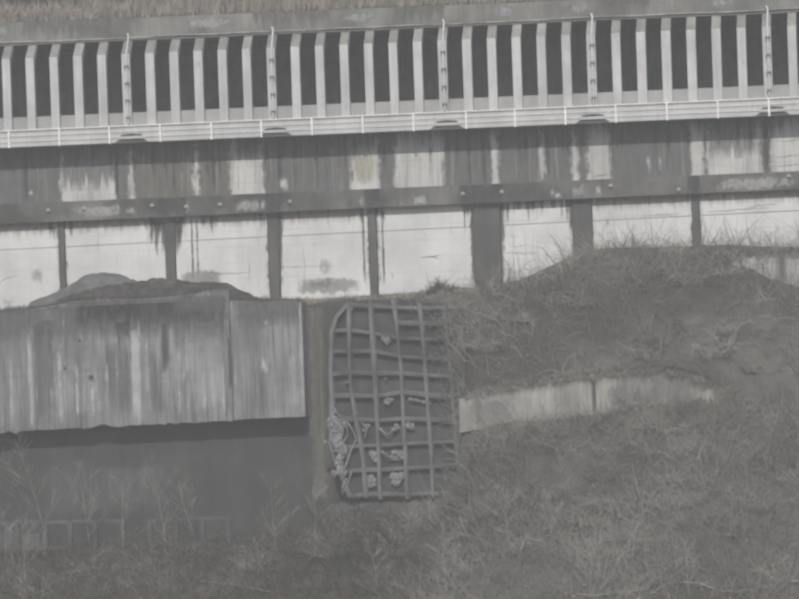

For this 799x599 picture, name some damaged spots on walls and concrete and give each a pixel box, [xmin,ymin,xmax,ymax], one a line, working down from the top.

water stain [0,131,409,285]
water stain [420,115,792,282]
water stain [0,295,224,418]